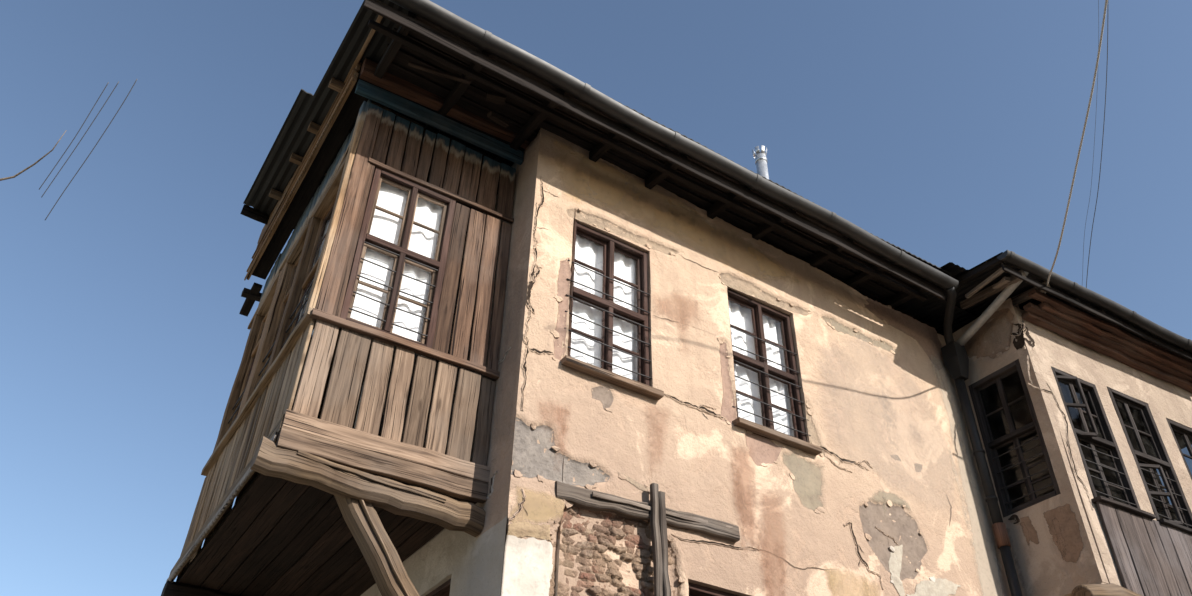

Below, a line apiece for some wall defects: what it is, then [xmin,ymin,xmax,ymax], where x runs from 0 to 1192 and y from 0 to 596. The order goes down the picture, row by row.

crack [520,176,558,411]
flaking render [591,386,613,412]
crack [664,393,727,421]
flaking render [717,338,736,425]
flaking render [511,417,650,494]
flaking render [746,401,826,514]
crack [811,442,873,473]
flaking render [548,500,654,596]
flaking render [667,535,686,596]
flaking render [859,500,961,596]